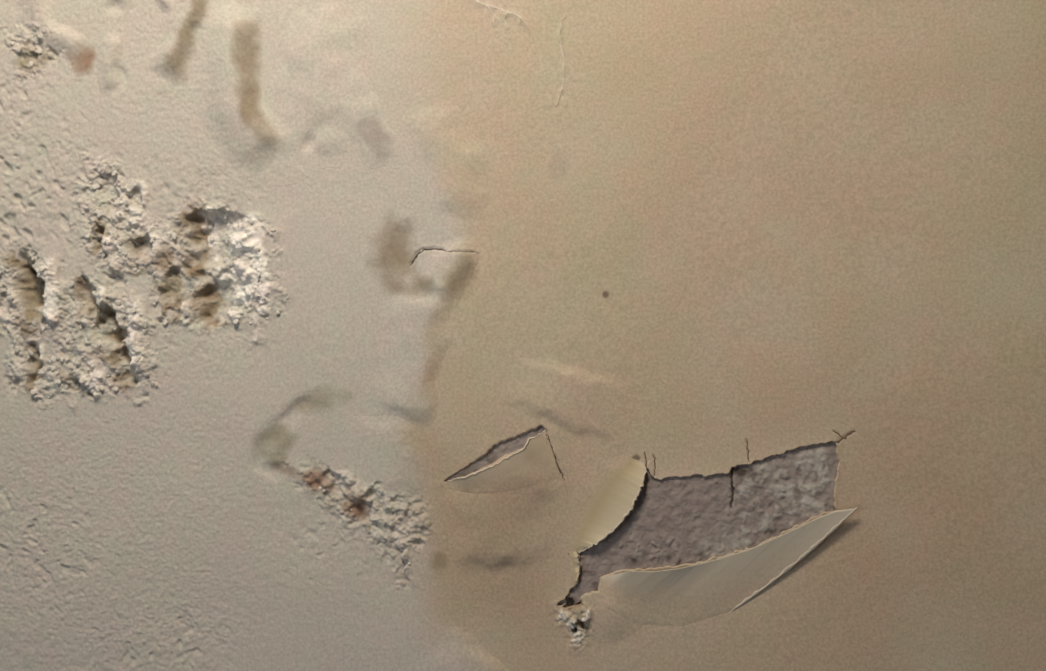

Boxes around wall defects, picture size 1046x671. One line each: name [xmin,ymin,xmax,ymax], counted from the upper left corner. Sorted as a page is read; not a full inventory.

flaking render [0,140,291,414]
crack [410,248,478,266]
flaking render [273,451,449,590]
peeling [549,442,857,655]